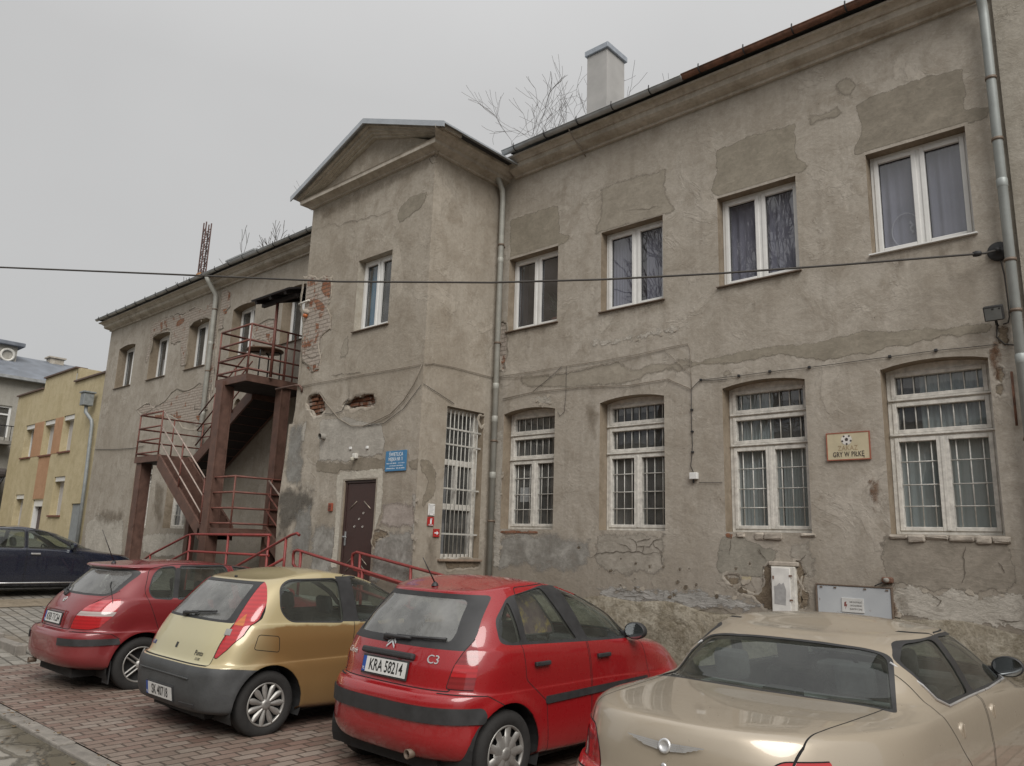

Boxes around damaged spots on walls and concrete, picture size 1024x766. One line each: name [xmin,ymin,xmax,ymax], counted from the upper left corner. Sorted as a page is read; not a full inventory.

flaking render [300,274,333,372]
spalling [300,390,378,443]
crack [589,538,662,562]
spalling [792,558,812,611]
peeling [893,584,1024,632]